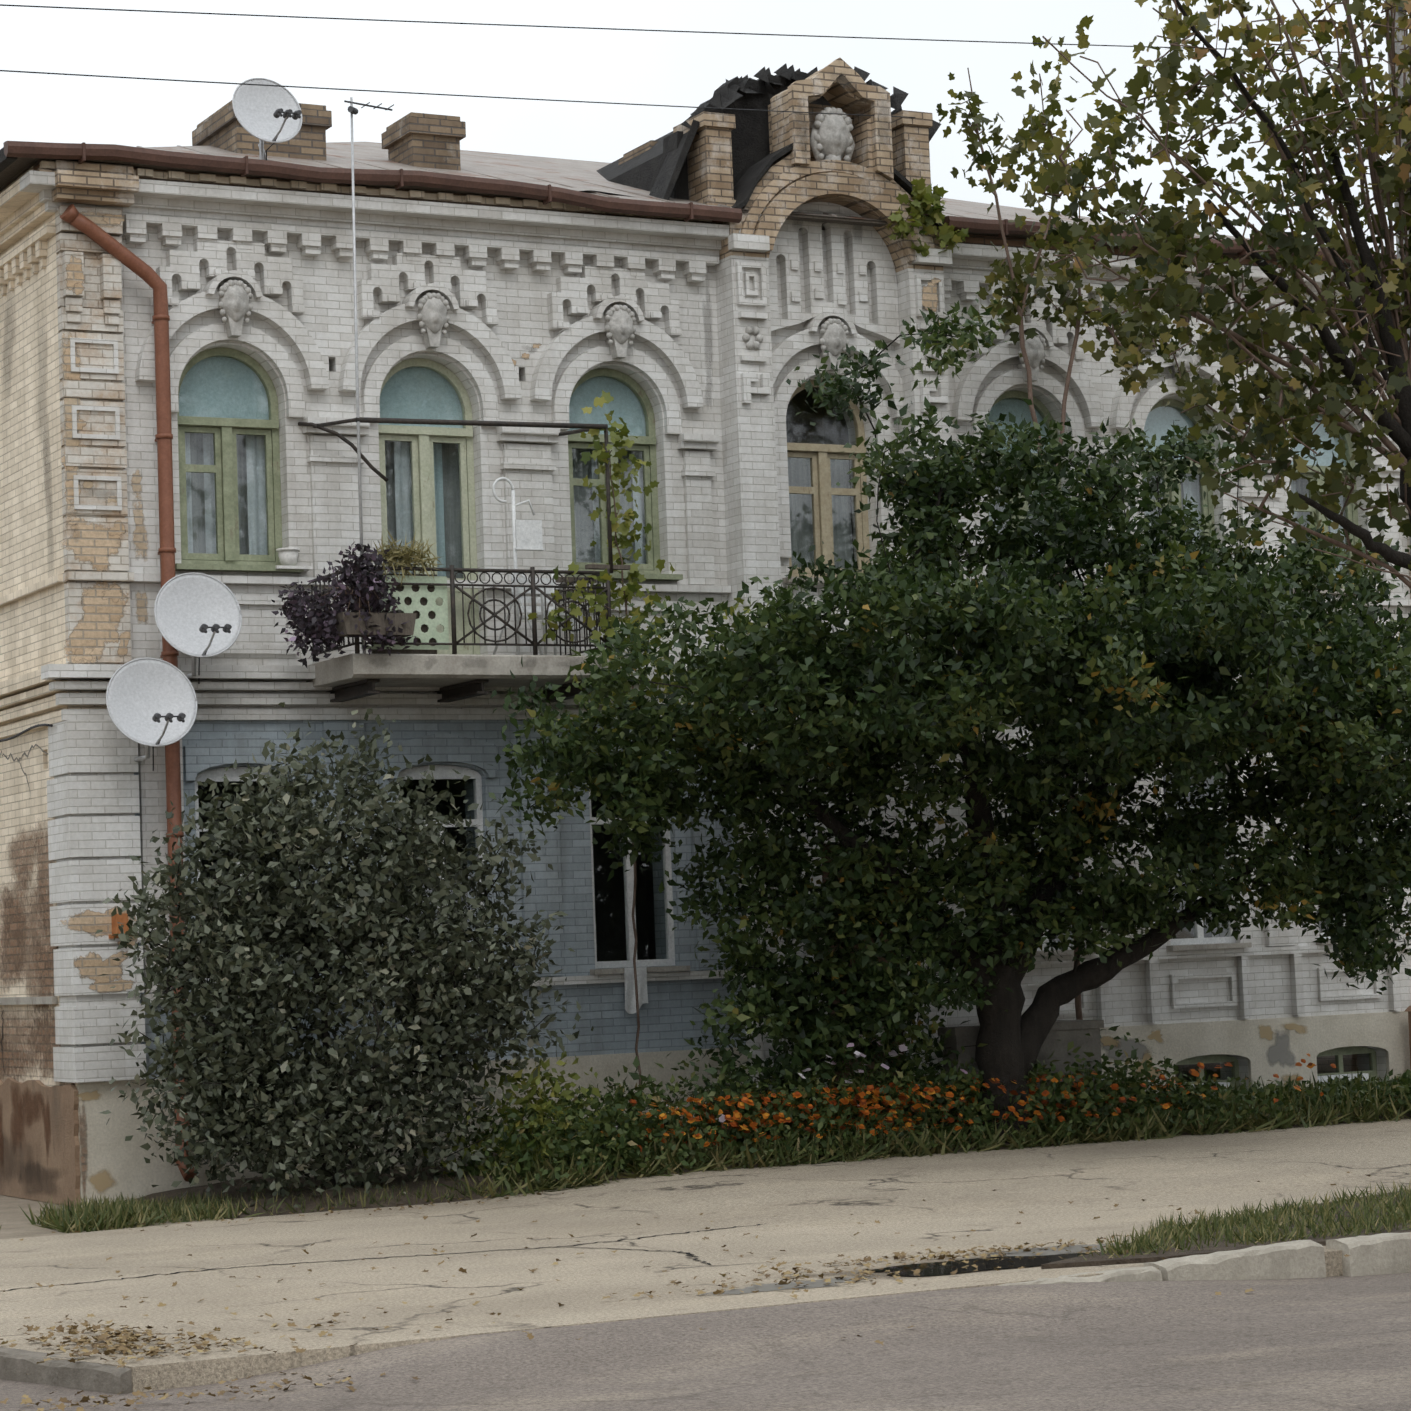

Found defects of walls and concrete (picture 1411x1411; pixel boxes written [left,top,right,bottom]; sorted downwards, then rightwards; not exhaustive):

peeling [61,335,148,664]
peeling [0,832,137,1077]
flaking render [79,1091,113,1192]
flaking render [1260,1024,1305,1087]